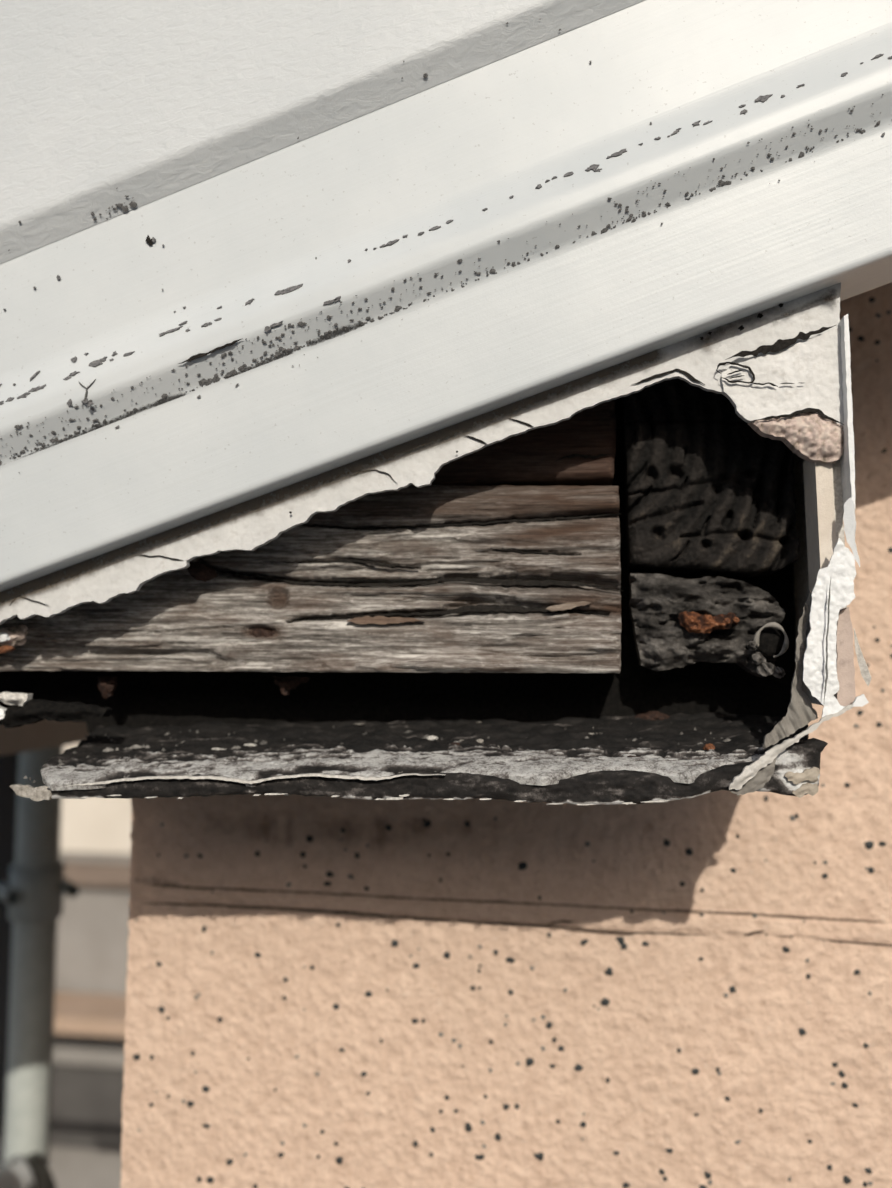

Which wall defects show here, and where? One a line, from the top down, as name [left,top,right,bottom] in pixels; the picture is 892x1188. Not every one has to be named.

damp [572,94,885,243]
damp [91,188,137,221]
peeling [365,220,453,251]
damp [702,315,758,345]
peeling [0,371,46,405]
peeling [63,351,135,380]
damp [0,241,560,473]
spalling [748,412,844,464]
damp [0,350,661,606]
corrosion [678,611,740,634]
peeling [729,497,872,790]
crack [145,885,892,946]